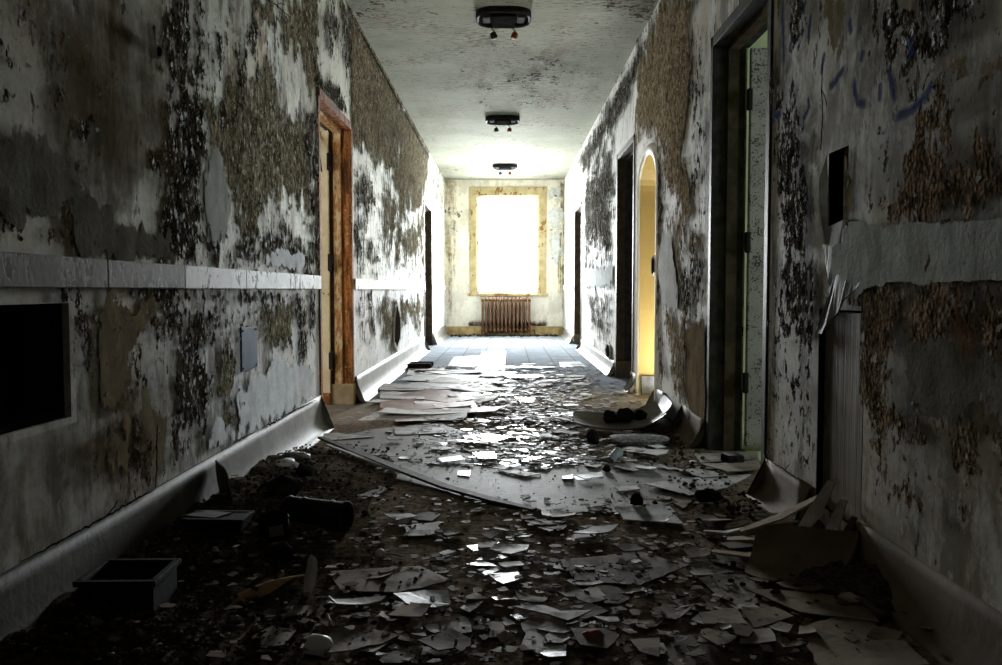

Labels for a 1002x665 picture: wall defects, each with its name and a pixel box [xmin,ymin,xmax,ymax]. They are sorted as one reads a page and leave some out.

leakage [53,0,167,211]
flaking render [56,288,316,503]
peeling [0,0,462,357]
flaking render [831,0,1002,523]